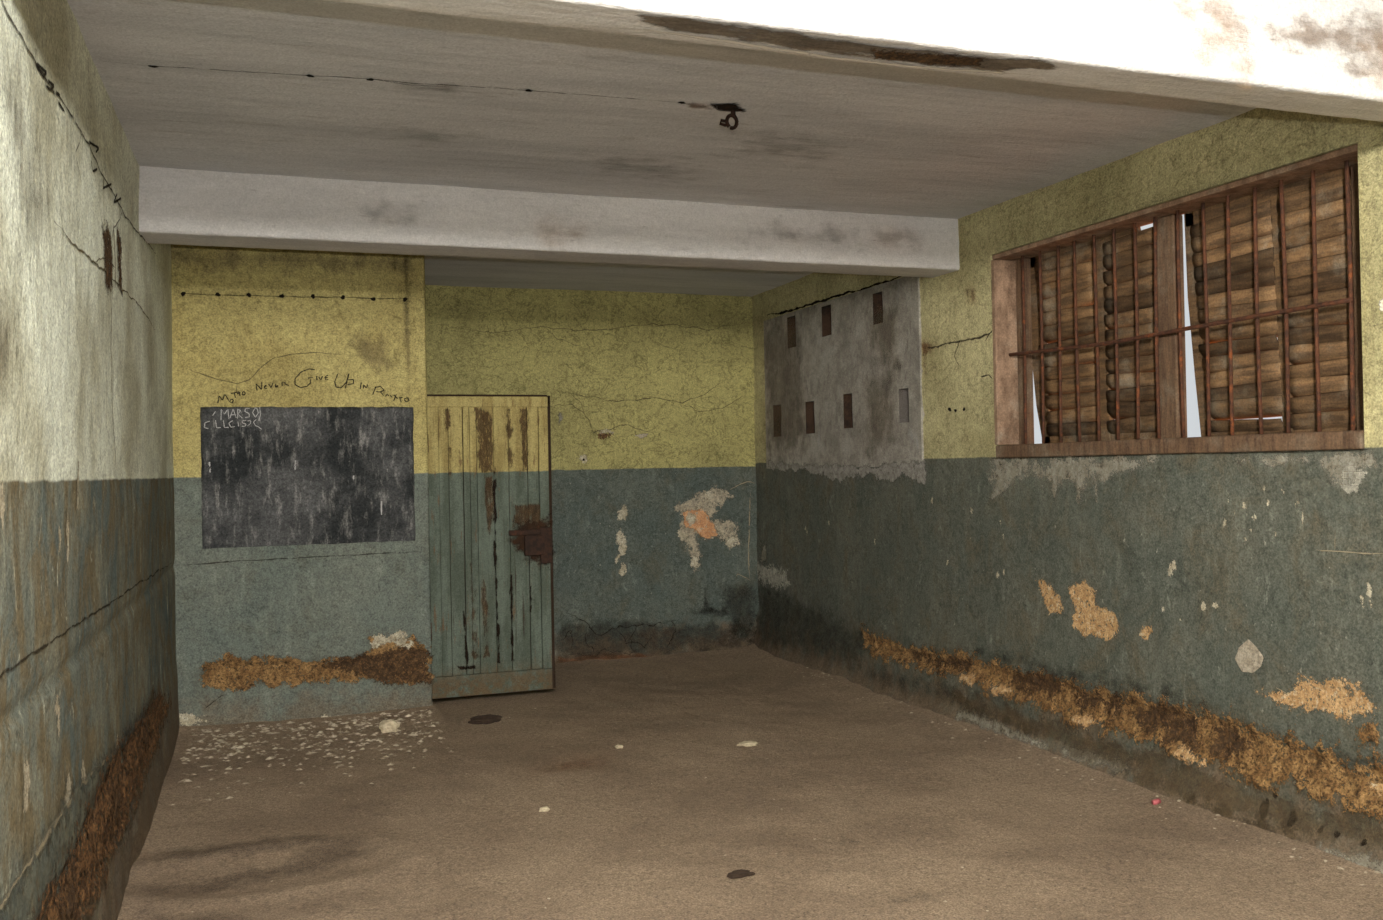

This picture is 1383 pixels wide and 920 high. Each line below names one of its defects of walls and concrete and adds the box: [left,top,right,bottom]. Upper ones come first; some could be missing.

crack [2,0,155,330]
crack [181,292,407,302]
peeling [615,504,629,576]
peeling [674,481,756,580]
crack [0,551,421,678]
peeling [1035,579,1119,641]
flaking render [199,630,435,694]
flaking render [859,623,1383,823]
peeling [23,760,31,814]